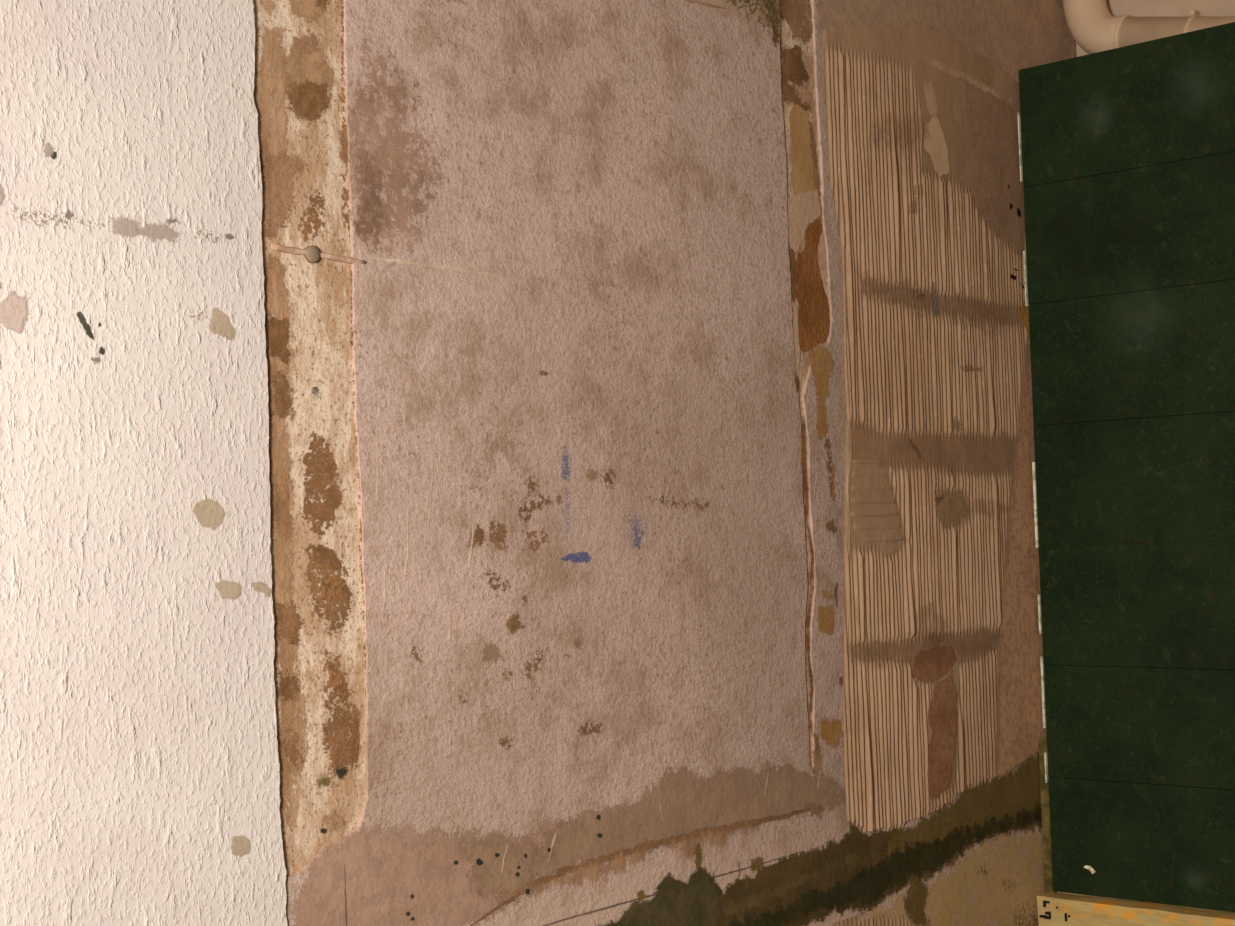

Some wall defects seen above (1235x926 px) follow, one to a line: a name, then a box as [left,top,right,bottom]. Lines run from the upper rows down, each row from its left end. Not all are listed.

peeling [0,287,28,333]
spalling [788,219,830,377]
leakage [316,768,347,790]
leakage [320,810,344,833]
leakage [598,752,1057,926]